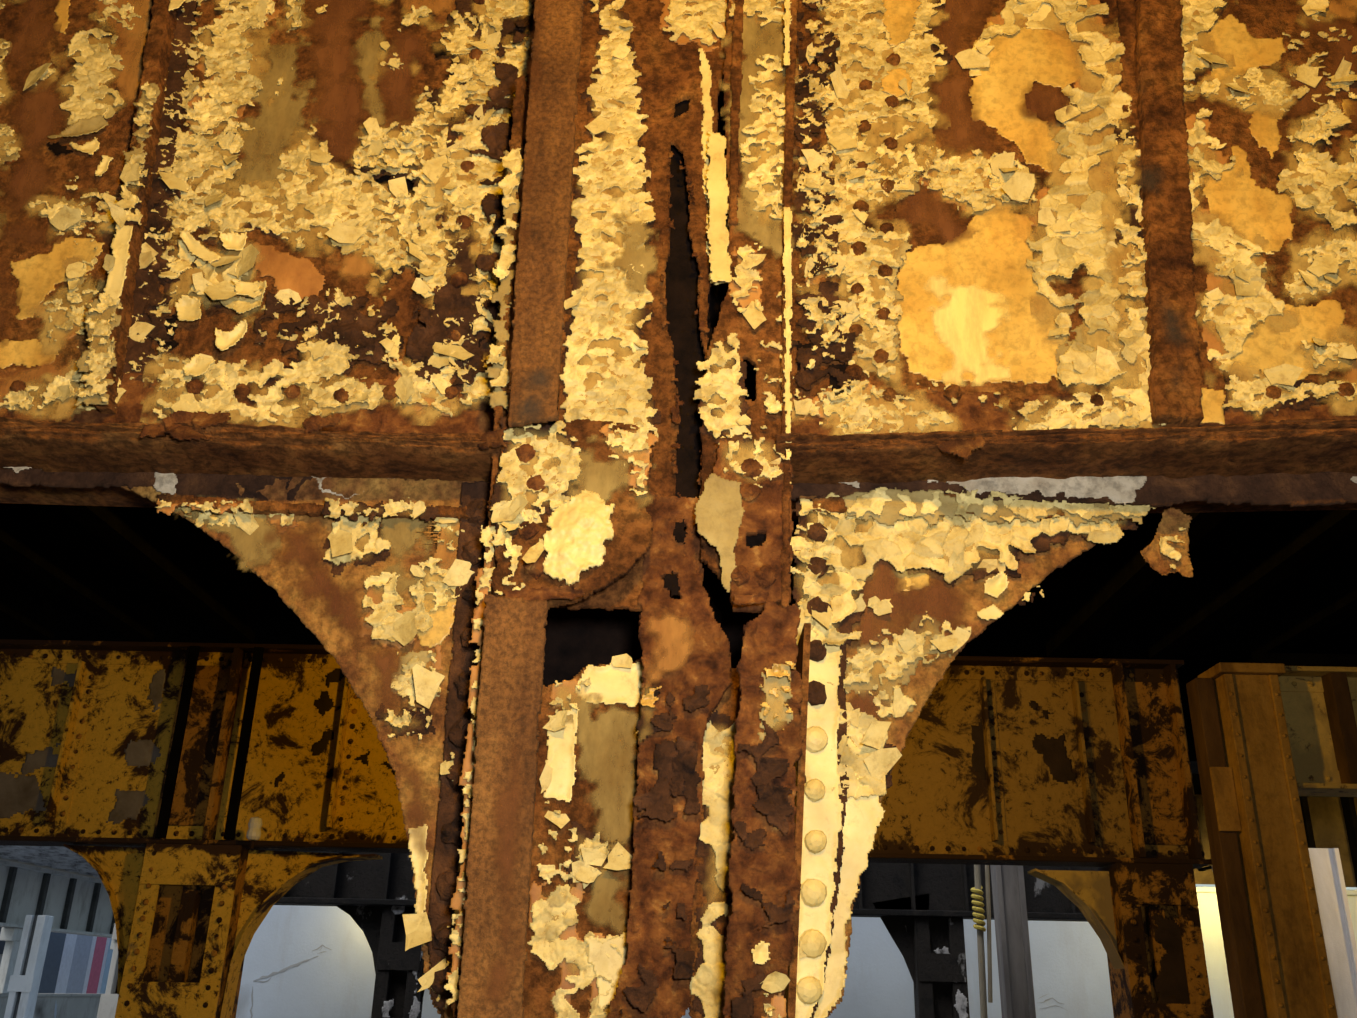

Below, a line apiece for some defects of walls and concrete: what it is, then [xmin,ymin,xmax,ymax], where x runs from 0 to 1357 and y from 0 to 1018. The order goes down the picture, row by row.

rust [140,410,231,441]
rust [302,414,342,434]
peeling [0,0,661,1018]
rust [791,0,856,415]
peeling [659,0,1166,593]
rust [936,435,985,460]
peeling [1180,0,1357,425]
rust [632,616,710,823]
peeling [690,710,736,1018]
rust [730,971,787,1018]
rust [734,661,796,851]
peeling [751,476,1193,1018]